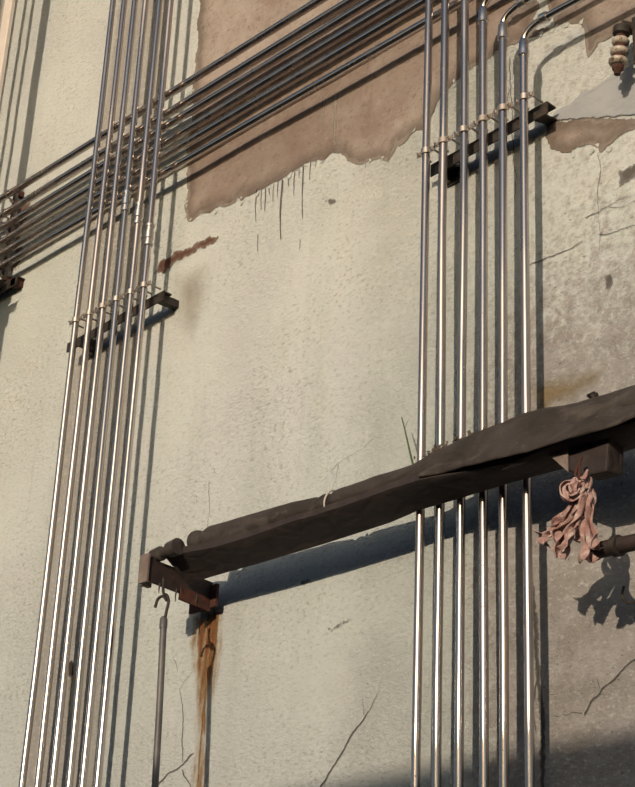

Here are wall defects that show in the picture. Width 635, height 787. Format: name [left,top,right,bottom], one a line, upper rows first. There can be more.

water stain [255,162,316,239]
peeling [183,0,635,222]
crack [159,659,193,787]
corrosion [192,608,219,787]
crack [320,695,377,787]
crack [533,586,635,787]